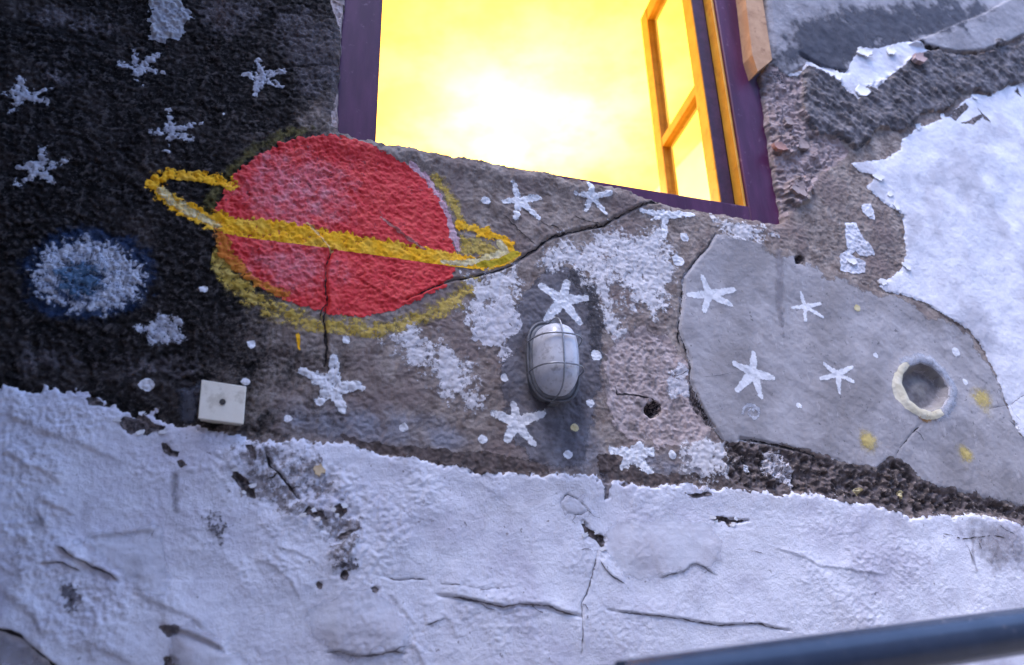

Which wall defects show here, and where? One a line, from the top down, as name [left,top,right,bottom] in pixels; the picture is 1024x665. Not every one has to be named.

crack [320,253,331,367]
crack [407,200,672,299]
spalling [537,219,1024,527]
peeling [709,37,1024,437]
spalling [229,435,361,580]
crack [384,548,624,652]